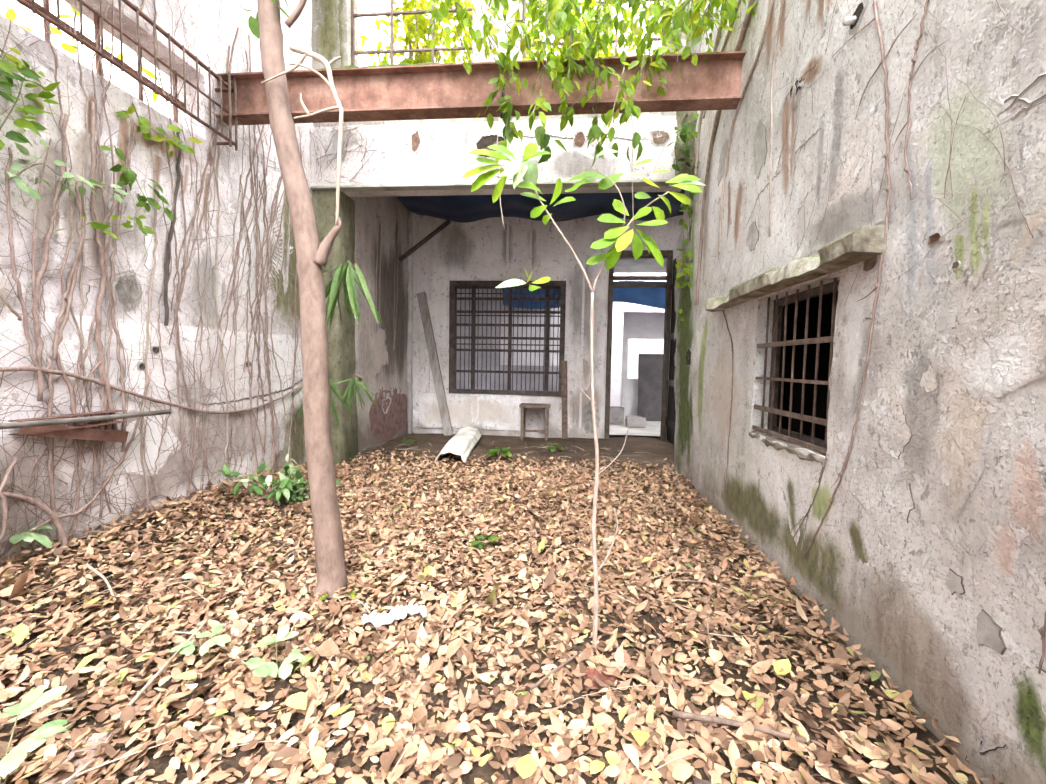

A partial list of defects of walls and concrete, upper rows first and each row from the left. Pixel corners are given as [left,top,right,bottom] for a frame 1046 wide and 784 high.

rust [30,75,47,140]
crack [983,73,1046,135]
spalling [649,111,697,184]
water stain [697,317,985,768]
peeling [945,569,965,595]
peeling [976,609,1007,655]